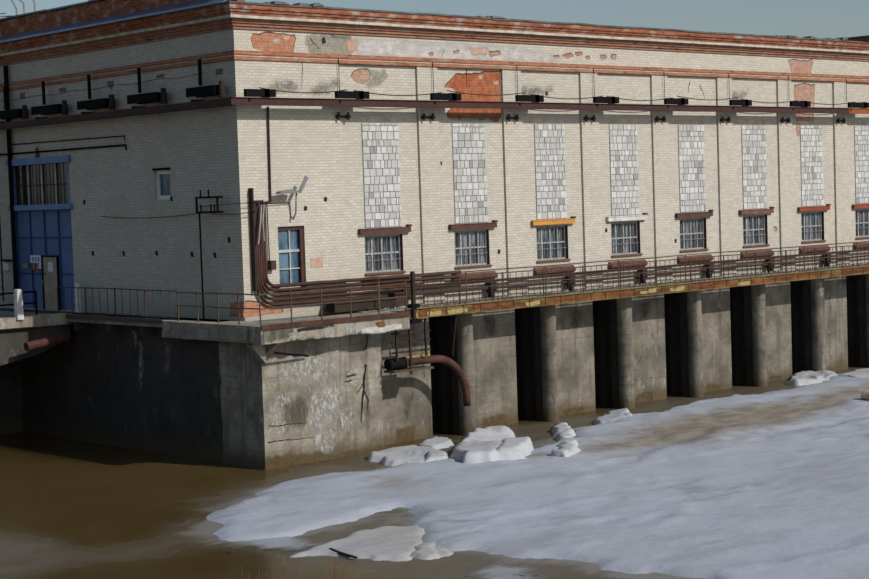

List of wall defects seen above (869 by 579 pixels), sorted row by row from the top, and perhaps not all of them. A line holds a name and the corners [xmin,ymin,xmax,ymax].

spalling [251,32,352,55]
spalling [444,71,502,122]
spalling [788,59,815,136]
damp [267,355,384,470]